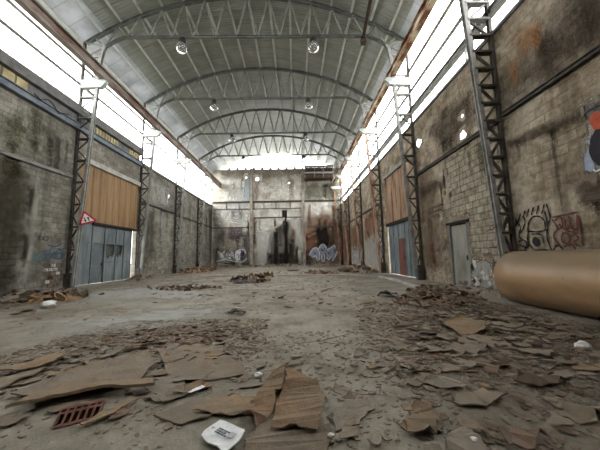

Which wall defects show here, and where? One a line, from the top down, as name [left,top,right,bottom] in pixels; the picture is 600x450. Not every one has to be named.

leakage [434,97,475,150]
corrosion [306,206,379,264]